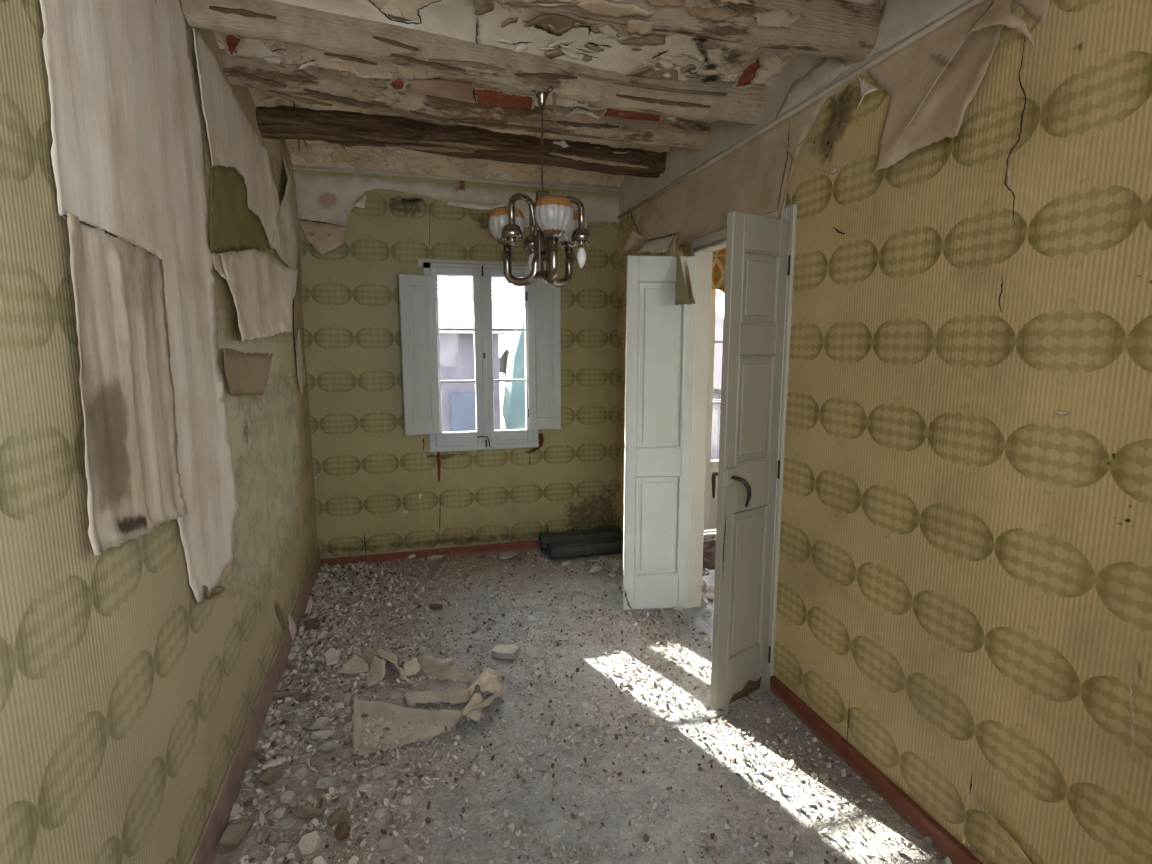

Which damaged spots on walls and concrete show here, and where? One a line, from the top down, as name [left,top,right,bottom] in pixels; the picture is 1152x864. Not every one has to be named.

spalling [221,32,360,87]
flaking render [386,71,536,109]
flaking render [273,0,804,81]
flaking render [732,53,764,88]
water stain [814,92,855,174]
crack [1004,38,1026,224]